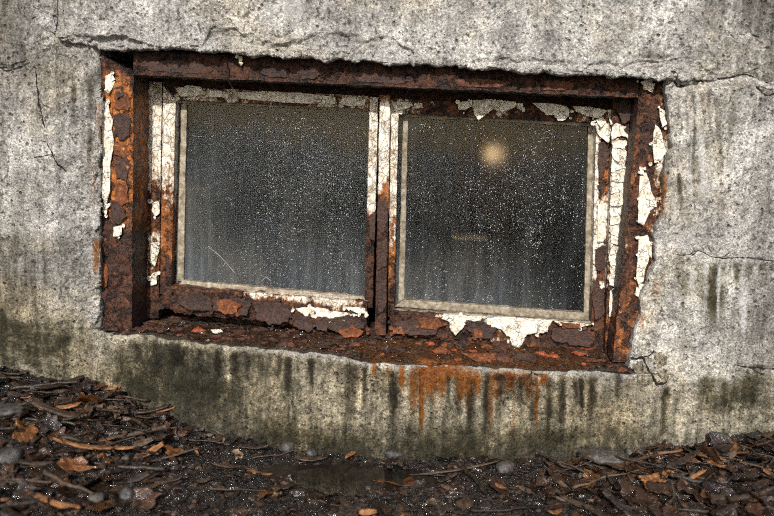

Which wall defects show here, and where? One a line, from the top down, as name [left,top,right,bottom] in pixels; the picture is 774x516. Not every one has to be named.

spalling [30,0,421,67]
peeling [455,99,629,317]
peeling [634,106,667,297]
crack [673,248,774,261]
corrosion [169,291,370,346]
corrosion [462,318,497,341]
corrosion [551,238,614,363]
damp [389,374,397,409]
damp [484,374,523,408]
damp [546,379,595,423]
crack [629,350,667,386]
crack [736,365,774,375]